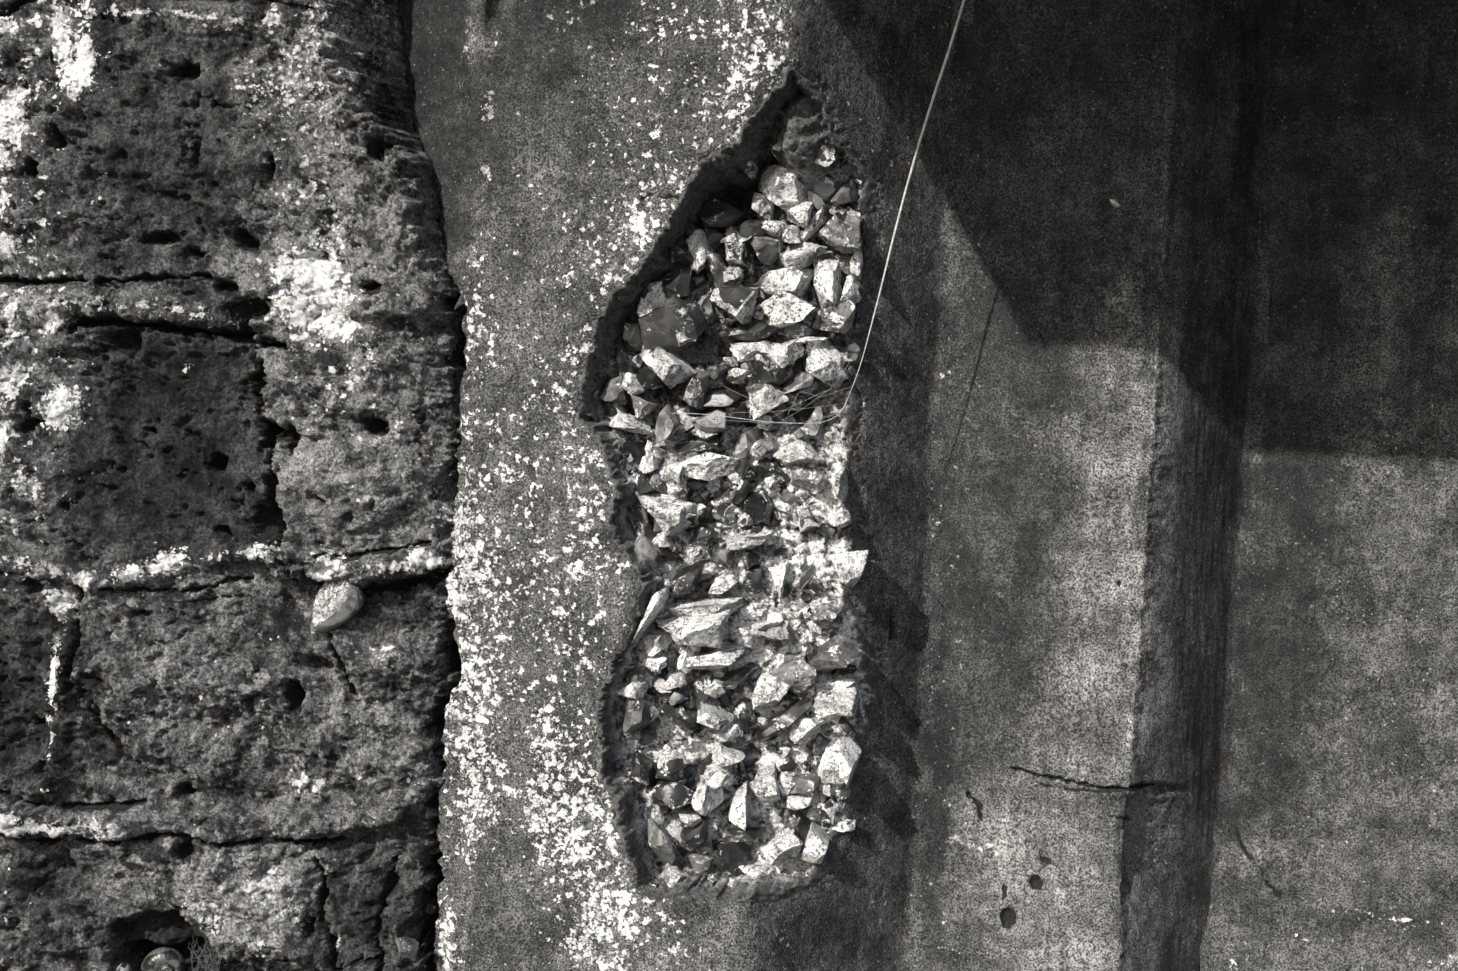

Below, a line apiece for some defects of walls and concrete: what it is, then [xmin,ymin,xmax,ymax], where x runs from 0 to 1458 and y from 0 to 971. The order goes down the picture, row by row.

spalling [576,64,885,907]
crack [1011,767,1156,820]